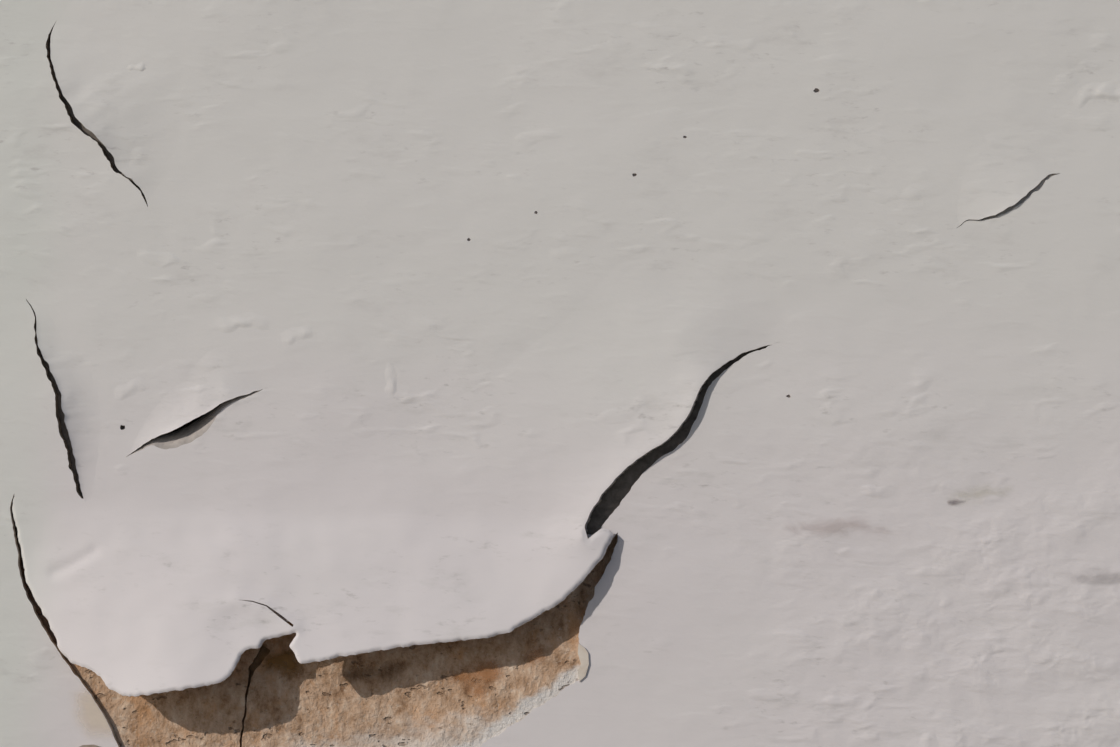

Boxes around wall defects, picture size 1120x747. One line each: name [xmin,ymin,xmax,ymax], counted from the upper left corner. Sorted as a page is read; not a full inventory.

crack [46,24,183,206]
crack [957,141,1059,228]
crack [29,303,101,502]
peeling [12,248,782,747]
crack [586,345,770,535]